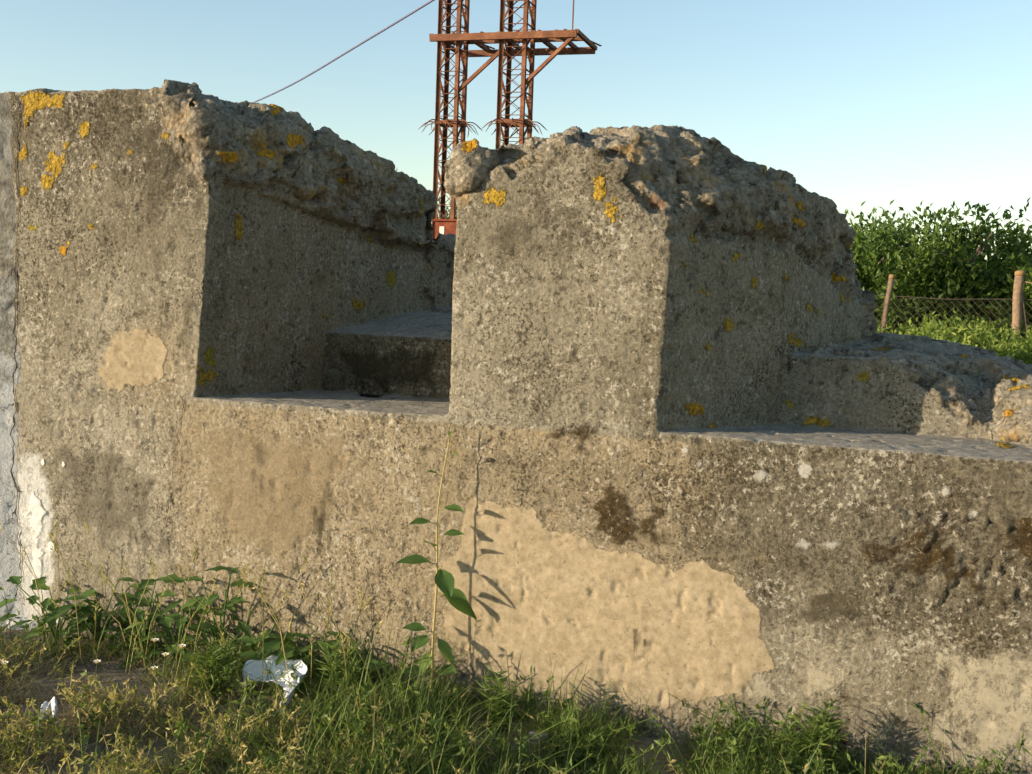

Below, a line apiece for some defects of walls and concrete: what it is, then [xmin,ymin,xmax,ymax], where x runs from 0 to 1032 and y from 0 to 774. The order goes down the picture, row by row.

spalling [9,79,403,215]
crack [0,99,46,598]
peeling [98,328,168,393]
spalling [353,222,453,254]
spalling [444,125,1032,442]
peeling [23,491,54,581]
peeling [438,493,774,713]